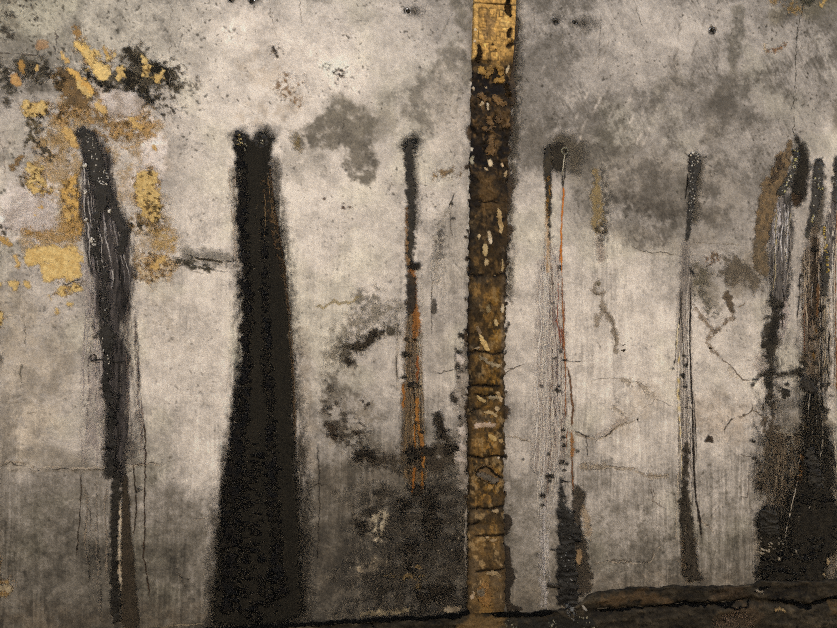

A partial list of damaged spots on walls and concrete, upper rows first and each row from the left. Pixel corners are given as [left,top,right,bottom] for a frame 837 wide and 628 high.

peeling [0,25,159,314]
water stain [21,101,170,628]
peeling [128,166,177,283]
peeling [140,55,166,84]
water stain [155,132,313,628]
water stain [317,138,468,617]
rust [556,155,575,488]
water stain [534,134,598,628]
water stain [673,135,837,583]
crack [791,1,805,134]